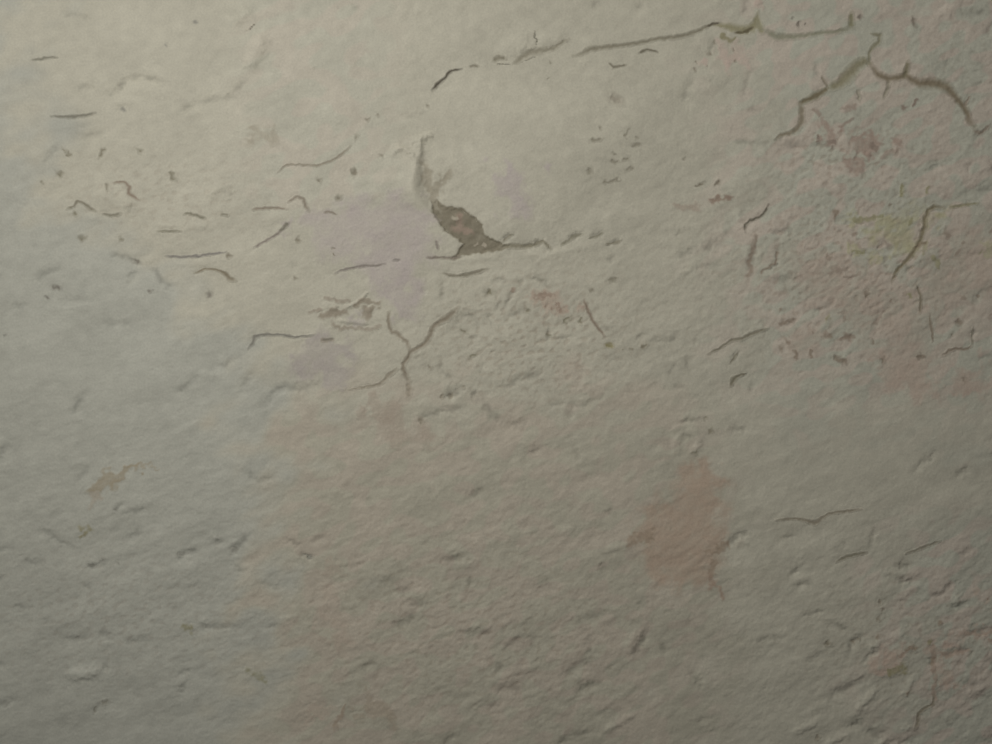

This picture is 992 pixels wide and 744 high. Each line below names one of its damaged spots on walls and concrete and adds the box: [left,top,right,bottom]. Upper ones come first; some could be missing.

crack [429,9,991,142]
peeling [348,130,504,259]
crack [247,332,335,351]
crack [333,257,401,276]
crack [347,304,461,401]
crack [425,231,623,279]
crack [582,297,606,339]
crack [890,201,980,358]
leakage [620,449,746,605]